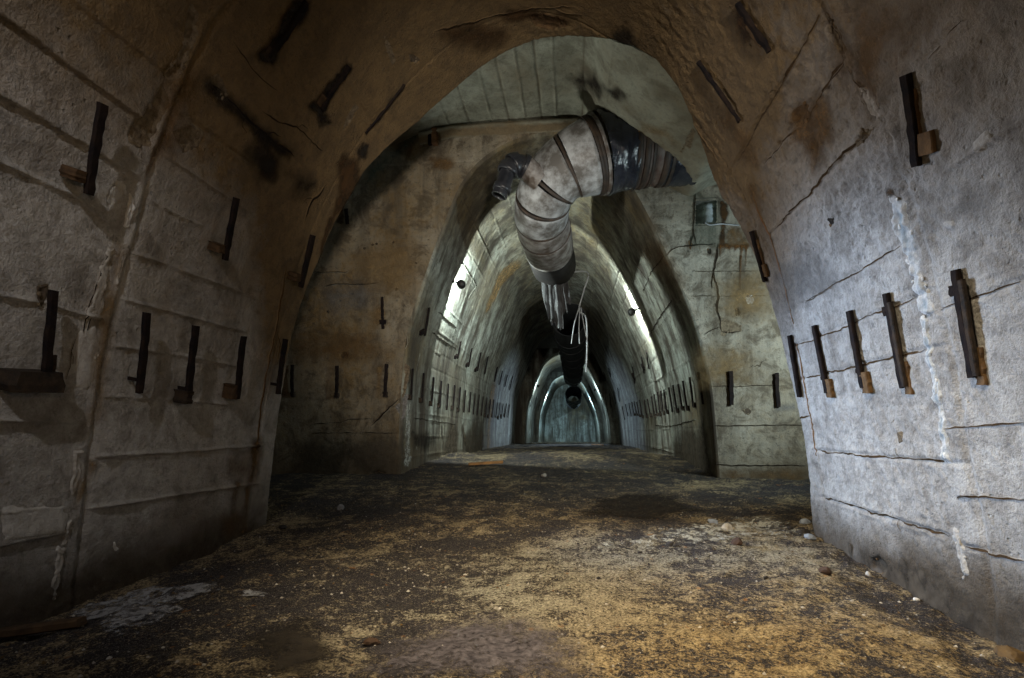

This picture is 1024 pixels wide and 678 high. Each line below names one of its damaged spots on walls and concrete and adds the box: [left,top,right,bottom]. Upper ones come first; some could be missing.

rust [719,201,750,279]
crack [632,13,945,466]
water stain [888,195,953,464]
water stain [10,519,220,632]
water stain [952,527,969,579]